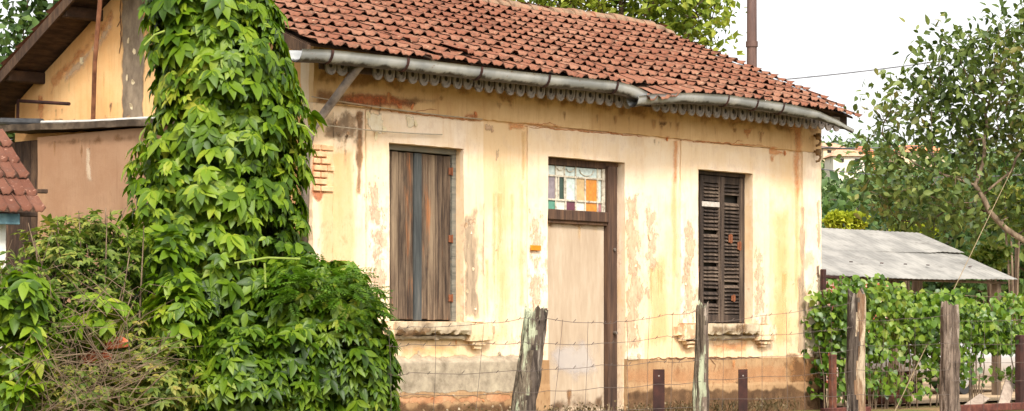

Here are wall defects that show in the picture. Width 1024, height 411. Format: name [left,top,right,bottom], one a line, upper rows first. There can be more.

water stain [109,0,145,118]
flaking render [312,144,334,200]
water stain [318,71,416,193]
water stain [561,97,679,127]
water stain [695,113,812,192]
peeling [464,210,478,317]
peeling [625,194,657,360]
water stain [628,388,693,411]
water stain [709,352,819,411]